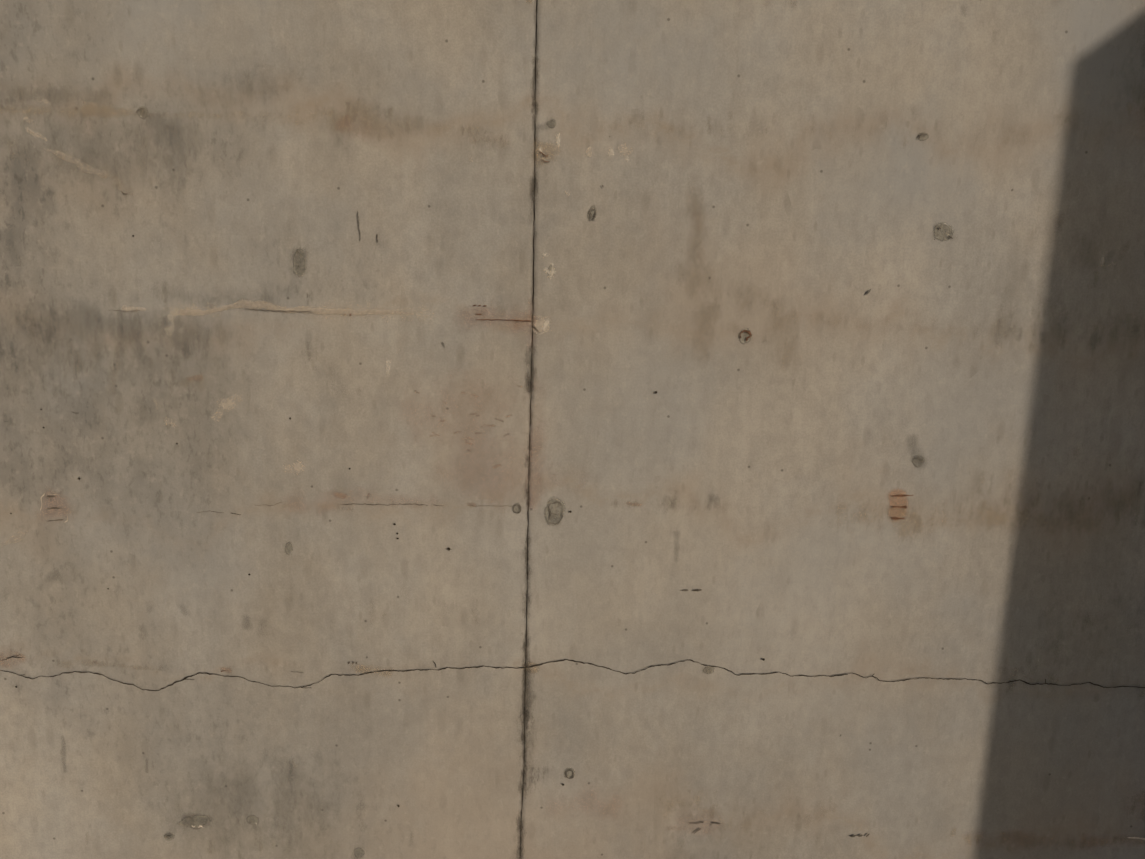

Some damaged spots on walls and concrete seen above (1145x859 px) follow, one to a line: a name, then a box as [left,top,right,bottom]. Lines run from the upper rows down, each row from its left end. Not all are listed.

crack [0,656,1145,691]